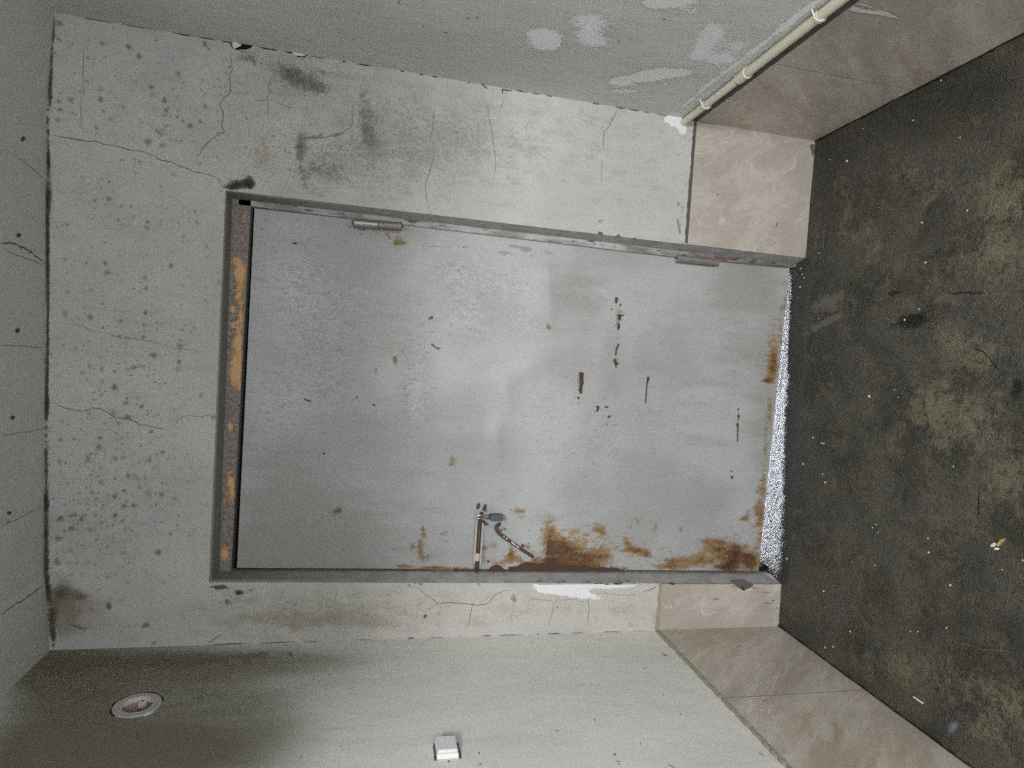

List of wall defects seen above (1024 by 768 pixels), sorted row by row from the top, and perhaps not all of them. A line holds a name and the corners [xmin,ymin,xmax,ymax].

crack [49,18,233,189]
damp [280,63,326,94]
crack [256,47,373,108]
crack [468,82,552,169]
damp [295,132,340,188]
rust [756,293,787,385]
rust [740,398,773,534]
rust [326,516,762,573]
crack [208,593,315,645]
crack [423,587,657,636]